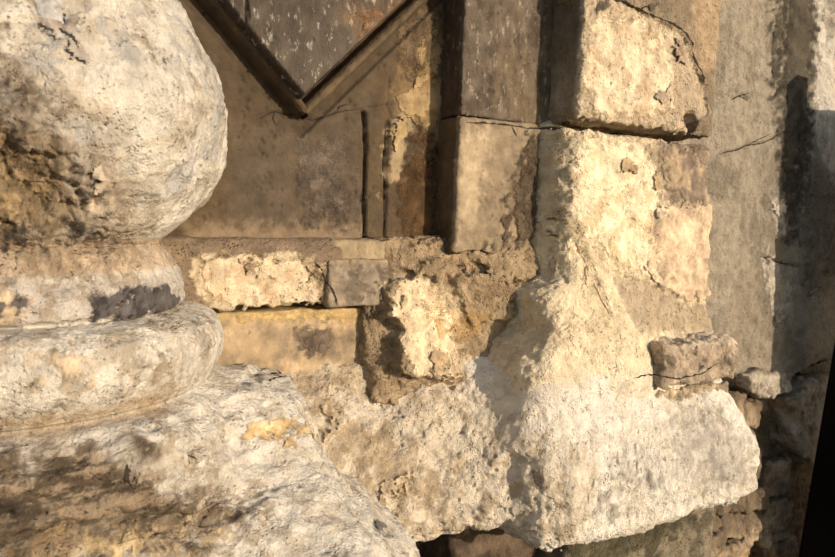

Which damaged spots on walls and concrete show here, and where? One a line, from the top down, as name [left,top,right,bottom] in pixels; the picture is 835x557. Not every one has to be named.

spalling [33,0,93,63]
crack [719,130,785,154]
spalling [64,154,128,219]
damp [0,294,28,318]
damp [89,284,181,324]
spalling [354,235,541,406]
crack [637,363,718,380]